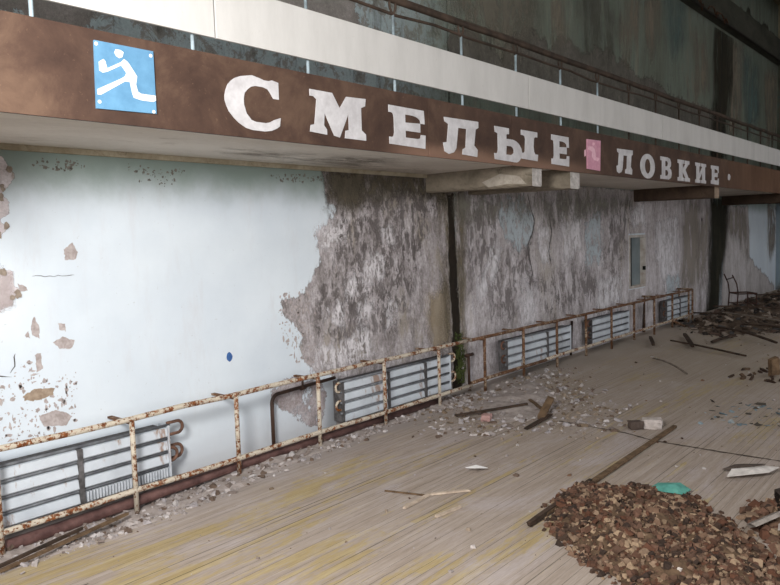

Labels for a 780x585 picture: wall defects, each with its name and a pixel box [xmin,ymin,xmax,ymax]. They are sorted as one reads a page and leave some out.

water stain [695,27,741,134]
peeling [0,156,15,239]
peeling [0,264,28,310]
spalling [25,317,40,339]
spalling [53,323,75,349]
peeling [64,243,78,260]
peeling [270,171,711,427]
peeling [722,205,774,305]
spalling [0,353,78,442]